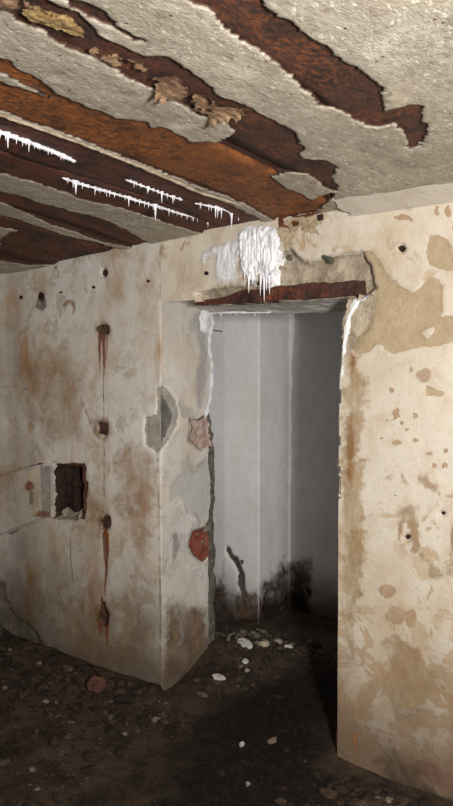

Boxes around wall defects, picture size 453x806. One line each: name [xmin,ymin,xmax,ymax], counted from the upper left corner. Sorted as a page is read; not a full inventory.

peeling [0,0,89,38]
peeling [152,76,244,128]
damp [201,224,286,298]
peeling [198,212,453,377]
corrosion [96,323,110,399]
damp [344,356,365,403]
flaking render [145,387,178,452]
peeling [171,415,212,577]
damp [342,412,364,596]
corrosion [99,514,111,587]
corrosion [96,597,110,646]
damp [213,562,311,624]